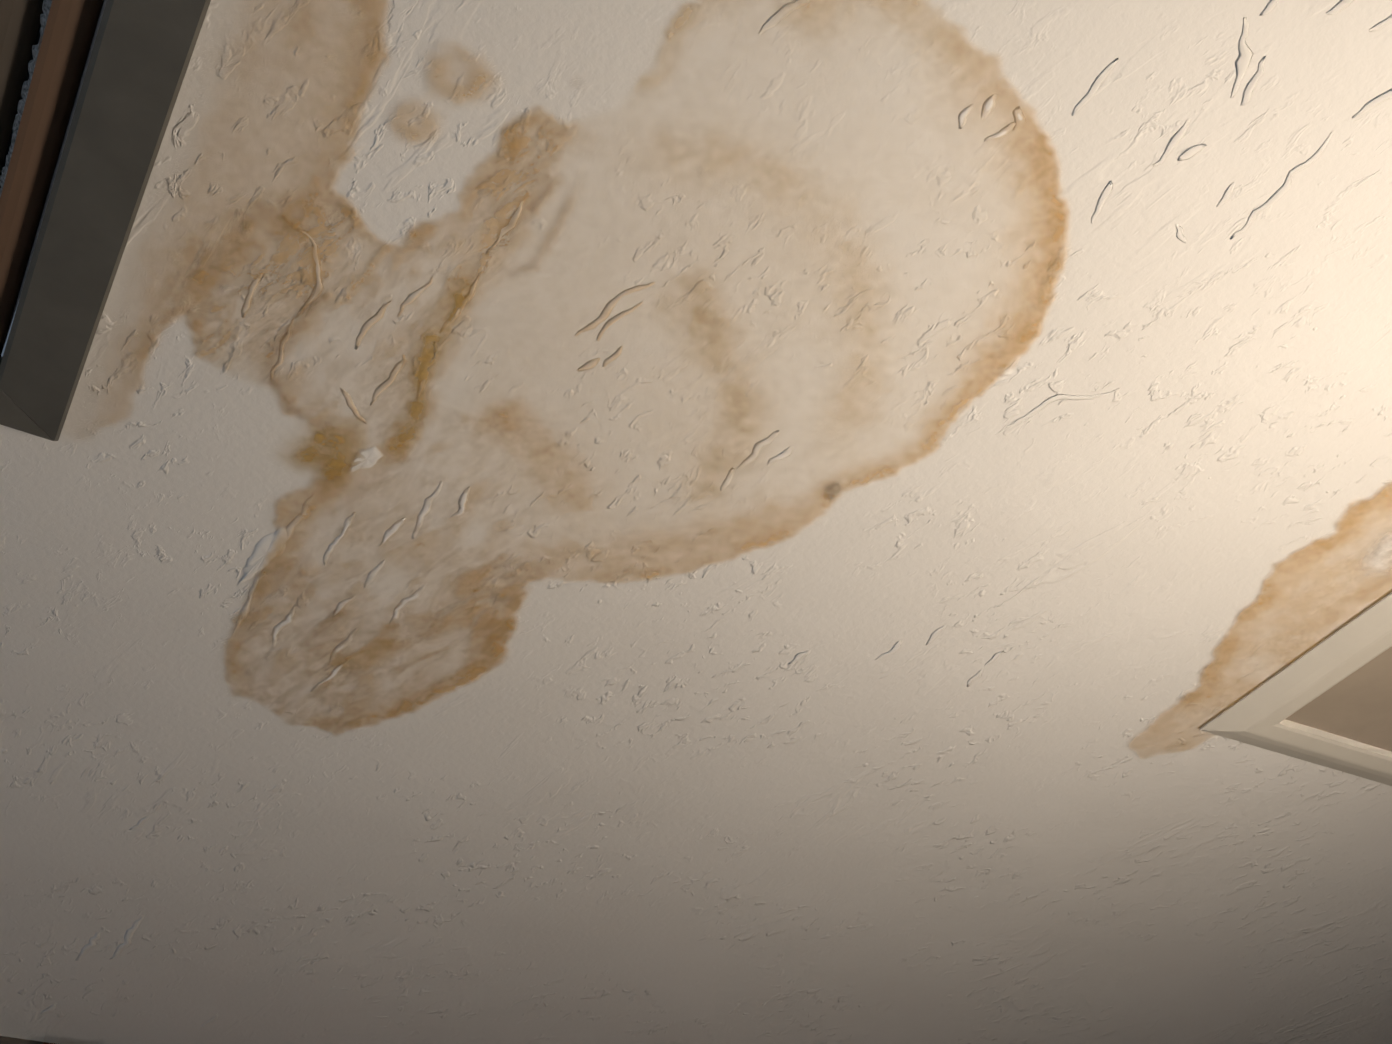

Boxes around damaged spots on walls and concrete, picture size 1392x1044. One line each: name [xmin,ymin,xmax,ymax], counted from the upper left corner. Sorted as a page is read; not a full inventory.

leakage [1365,534,1392,570]